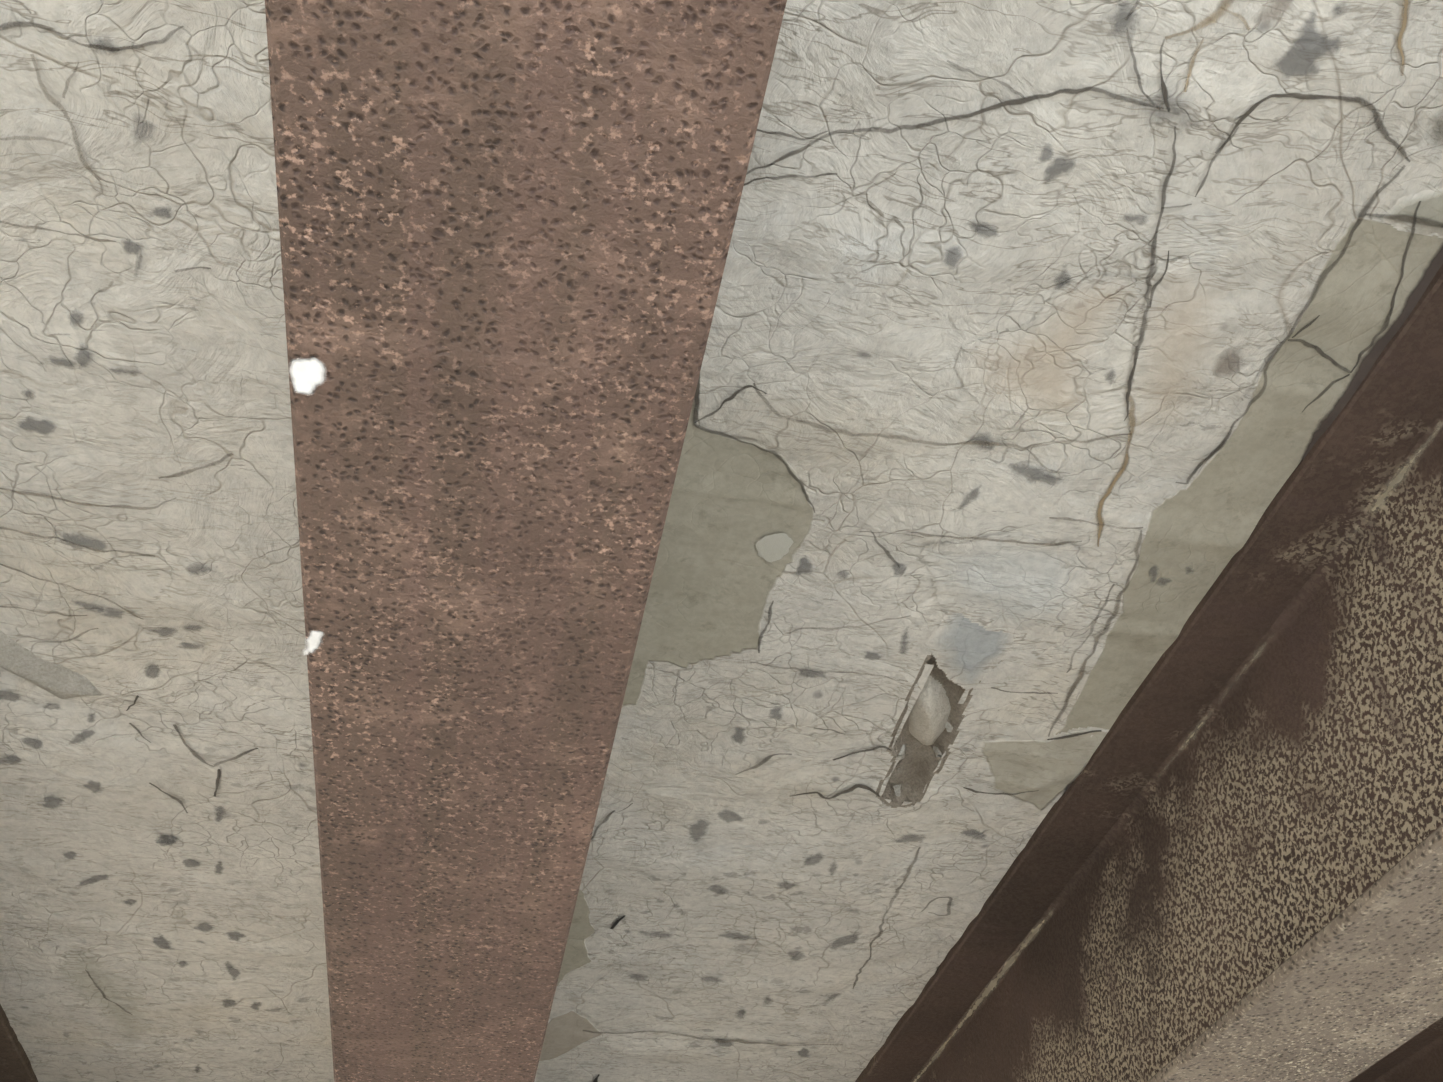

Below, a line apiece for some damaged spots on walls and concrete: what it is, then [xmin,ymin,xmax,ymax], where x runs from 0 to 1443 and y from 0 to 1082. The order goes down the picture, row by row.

rust [1165,0,1250,92]
rust [1397,0,1409,76]
crack [744,39,1443,441]
peeling [621,355,826,712]
crack [693,375,815,513]
rust [1097,411,1134,547]
peeling [864,214,1443,814]
crack [991,527,1143,740]
leakage [0,739,41,764]
leakage [71,715,93,743]
crack [792,730,892,799]
leakage [158,835,176,846]